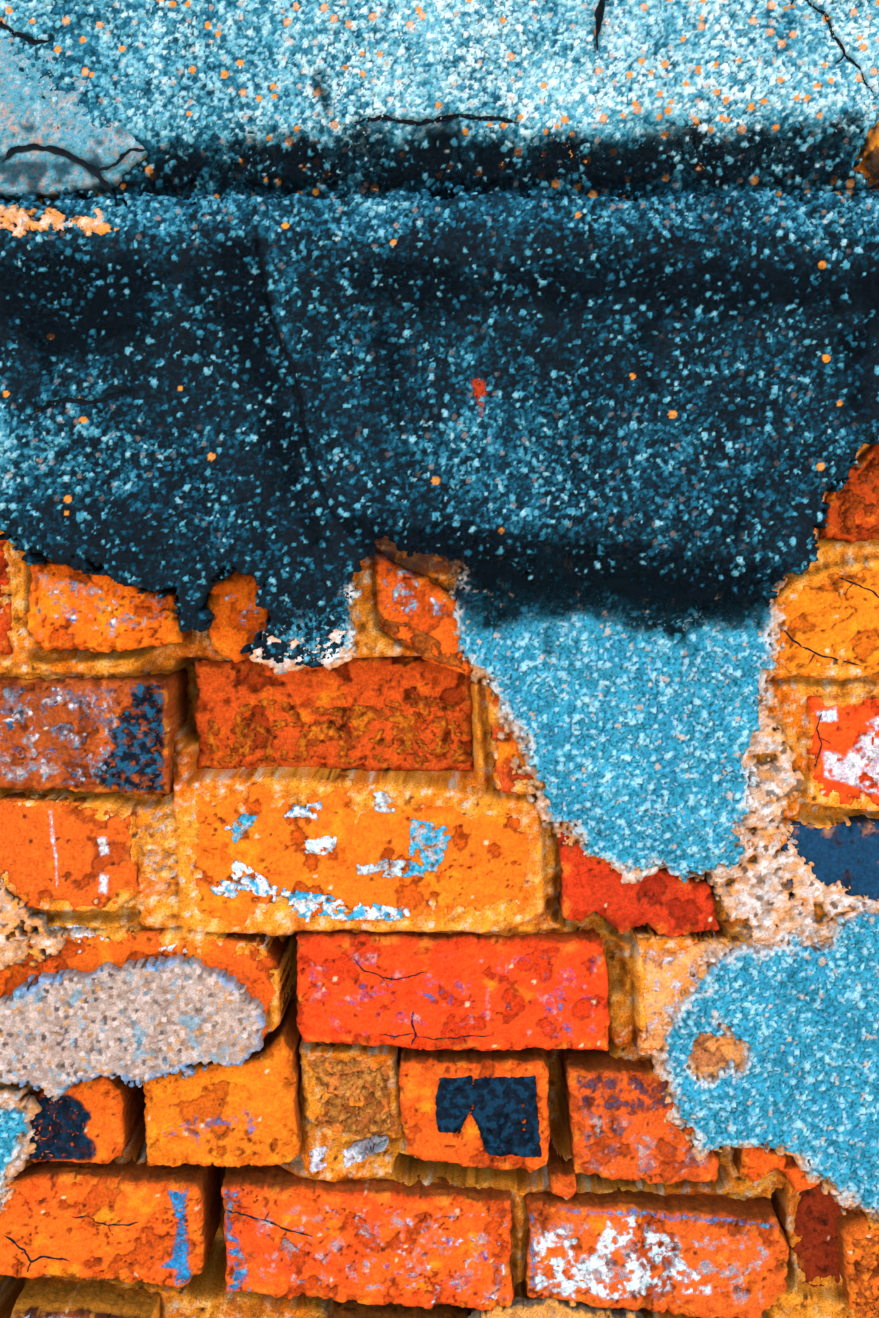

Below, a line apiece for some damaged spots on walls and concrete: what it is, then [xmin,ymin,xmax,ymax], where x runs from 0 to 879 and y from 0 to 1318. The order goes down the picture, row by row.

crack [0,20,52,45]
crack [594,0,607,51]
crack [791,0,875,94]
crack [257,243,333,516]
peeling [0,684,165,791]
peeling [824,718,879,794]
peeling [210,860,410,922]
peeling [357,819,452,878]
peeling [0,875,267,1213]
peeling [435,1075,542,1158]
peeling [162,1191,191,1285]
peeling [530,1210,770,1299]